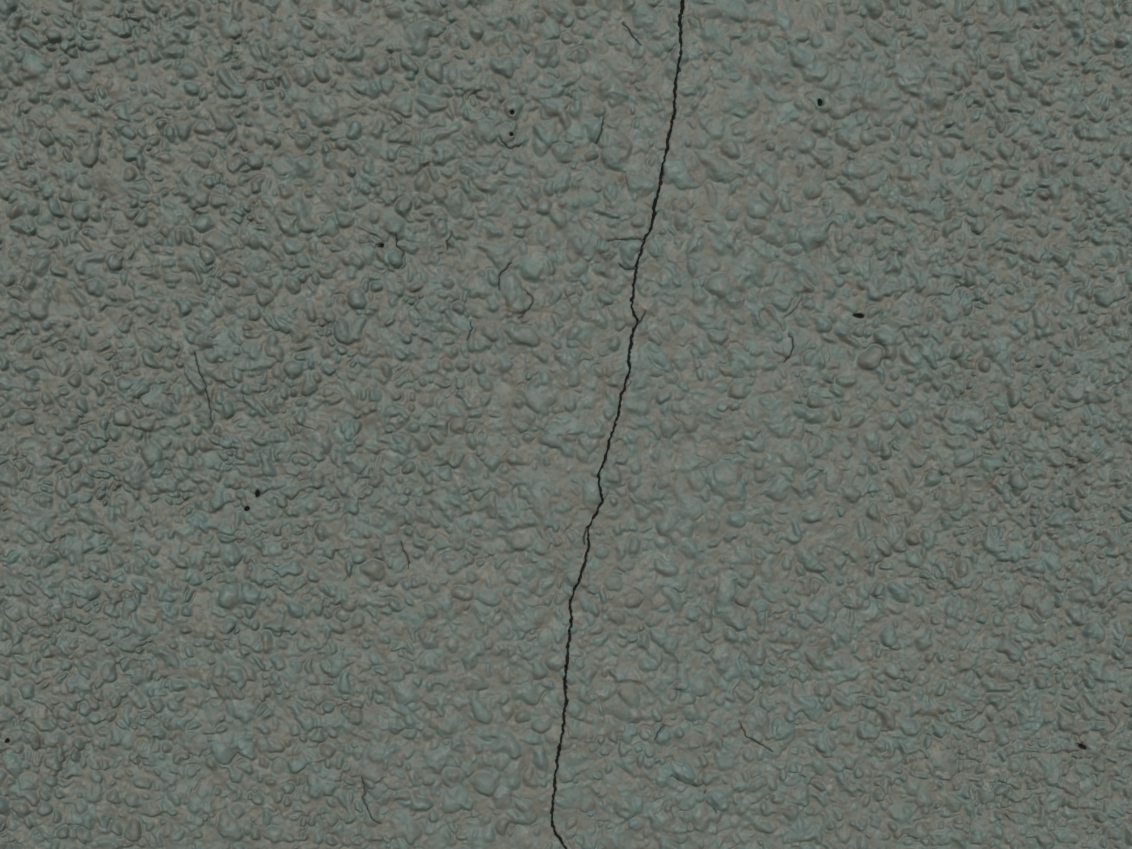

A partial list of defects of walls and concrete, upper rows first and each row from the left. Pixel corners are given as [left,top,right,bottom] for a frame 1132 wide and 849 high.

crack [550,0,685,849]